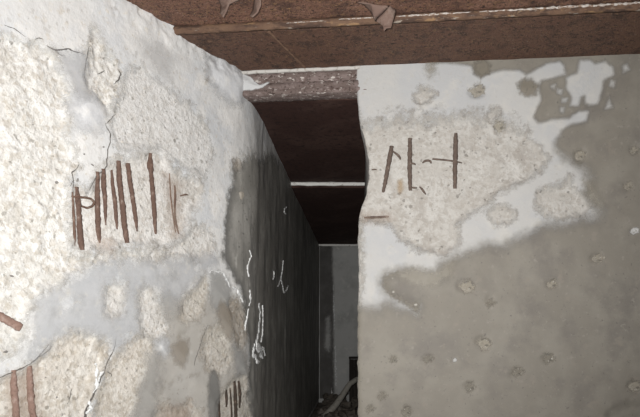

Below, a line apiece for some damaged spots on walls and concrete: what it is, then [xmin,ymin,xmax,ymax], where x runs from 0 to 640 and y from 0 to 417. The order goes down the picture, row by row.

crack [5,25,122,84]
spalling [469,82,485,98]
crack [69,114,116,194]
spalling [0,26,216,359]
water stain [29,154,337,417]
spalling [357,85,551,312]
water stain [357,54,640,417]
spalling [533,174,596,221]
spalling [0,281,169,417]
crack [84,339,116,417]
spalling [198,297,253,417]